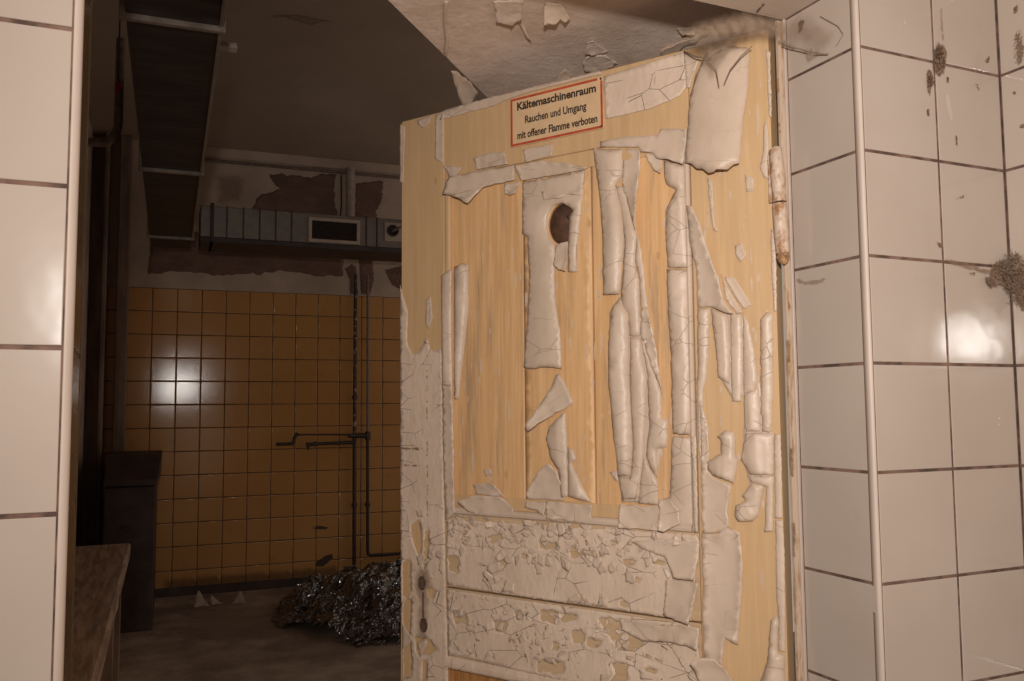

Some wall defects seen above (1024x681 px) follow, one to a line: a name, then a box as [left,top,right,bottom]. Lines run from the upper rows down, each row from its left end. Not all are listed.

peeling [582,41,618,73]
peeling [660,25,708,56]
mould [927,44,949,94]
peeling [252,167,337,215]
peeling [355,180,383,218]
peeling [148,232,402,295]
peeling [416,46,795,681]
peeling [400,591,427,657]